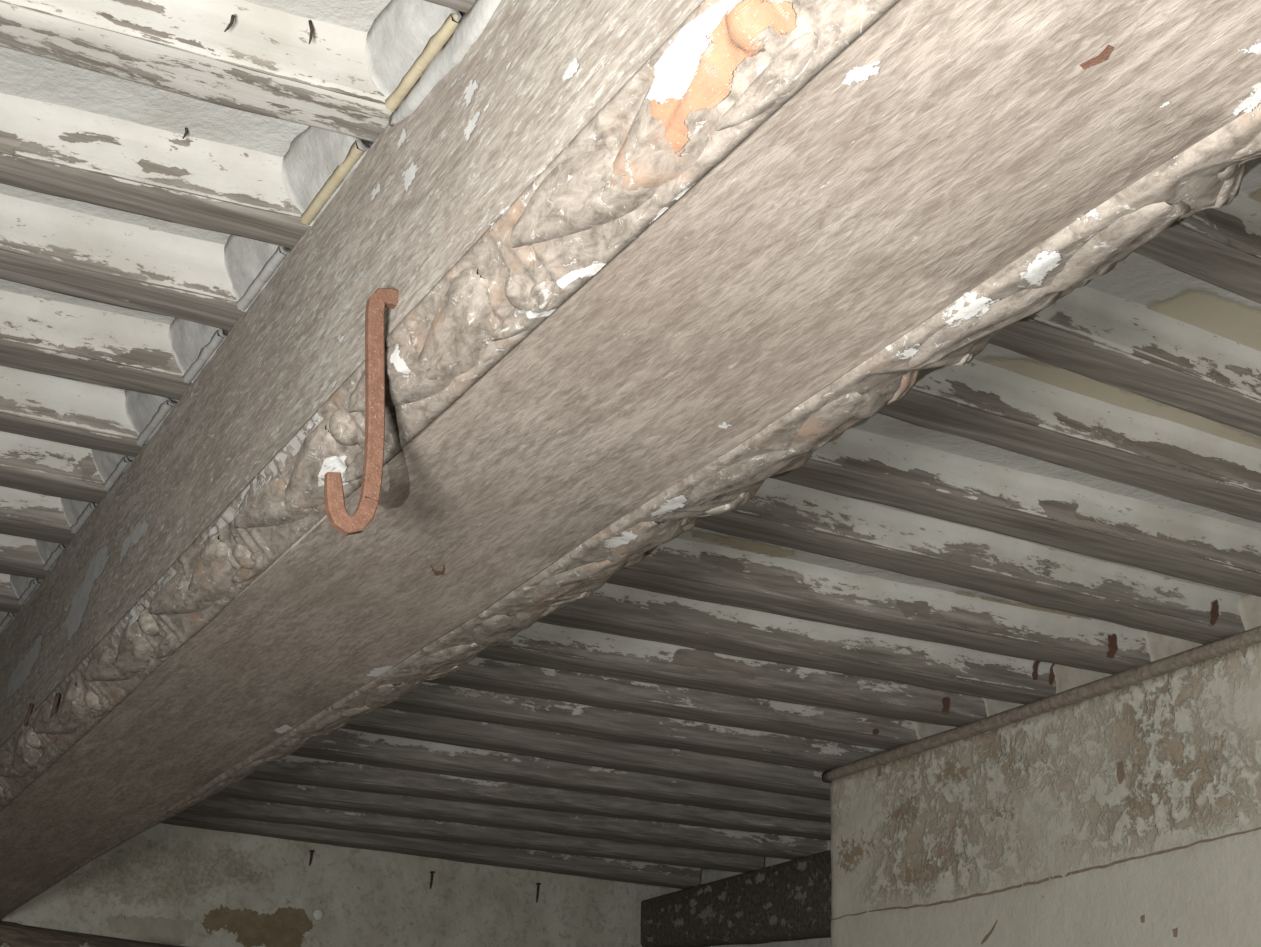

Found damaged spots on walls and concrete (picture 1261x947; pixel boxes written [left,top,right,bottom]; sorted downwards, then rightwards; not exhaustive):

peeling [96,0,220,56]
peeling [646,0,742,104]
peeling [59,132,124,146]
peeling [137,159,190,177]
peeling [556,263,606,289]
peeling [1020,247,1061,286]
peeling [942,290,1001,325]
peeling [390,343,411,374]
peeling [945,379,1261,490]
peeling [318,455,349,487]
crack [831,827,1261,945]
spalling [201,904,315,947]